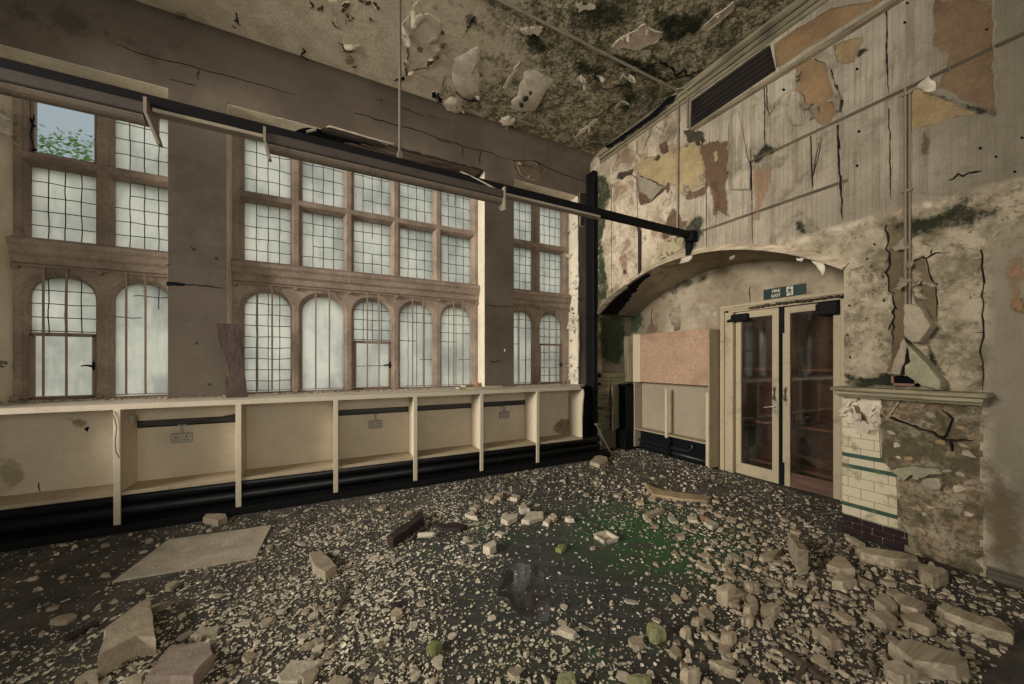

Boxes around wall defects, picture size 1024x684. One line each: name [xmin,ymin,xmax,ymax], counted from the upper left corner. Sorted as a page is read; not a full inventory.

crack [118,44,297,96]
leakage [575,48,673,83]
peeling [612,23,663,57]
peeling [700,1,735,31]
leakage [598,175,611,303]
leakage [896,200,997,237]
crack [884,224,948,353]
peeling [566,253,579,384]
leakage [599,314,643,364]
crack [972,249,986,388]
crack [889,409,973,452]
spalling [838,397,983,575]